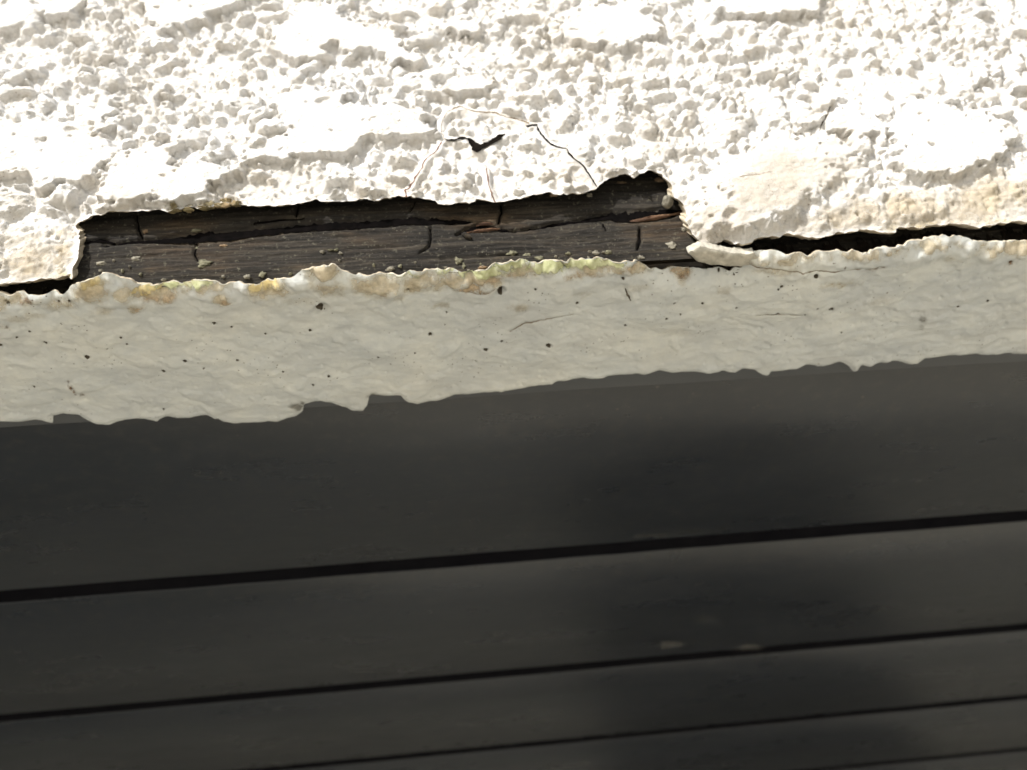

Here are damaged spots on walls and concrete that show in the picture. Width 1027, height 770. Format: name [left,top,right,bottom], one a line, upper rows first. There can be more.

crack [404,106,597,225]
spalling [65,170,758,279]
leakage [55,276,230,313]
leakage [248,278,288,298]
leakage [310,264,339,294]
leakage [352,265,535,297]
leakage [571,258,646,278]
crack [710,226,1027,275]